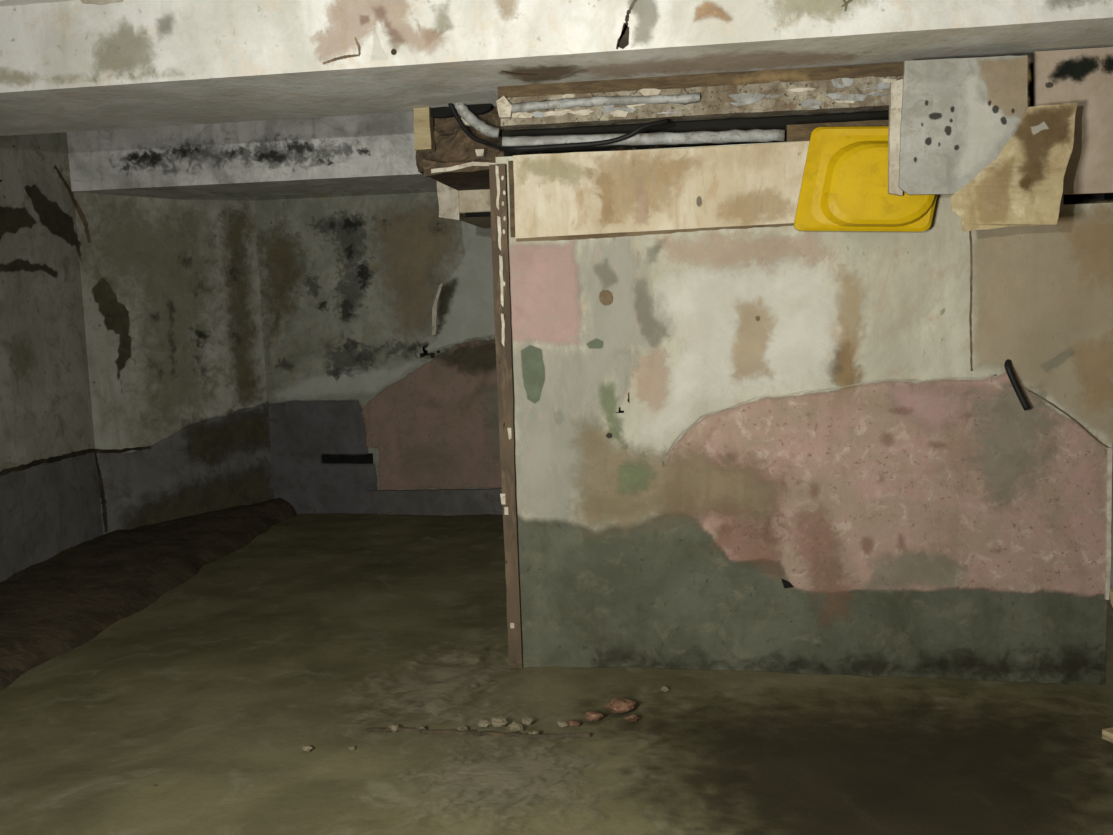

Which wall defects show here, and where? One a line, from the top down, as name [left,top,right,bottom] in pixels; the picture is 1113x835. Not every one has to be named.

peeling [714,76,896,110]
mould [123,146,198,170]
mould [229,142,333,165]
peeling [0,185,81,260]
peeling [0,259,57,277]
leakage [345,246,373,287]
peeling [92,278,131,379]
peeling [275,89,1113,596]
crack [0,446,151,532]
leakage [518,513,1113,689]